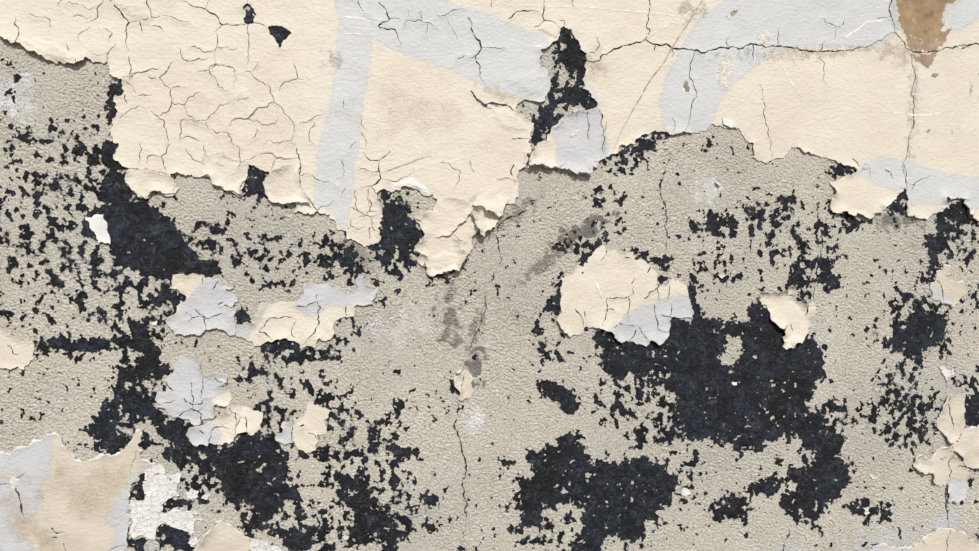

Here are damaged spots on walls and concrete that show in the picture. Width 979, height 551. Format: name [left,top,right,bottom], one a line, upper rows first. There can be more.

crack [14,0,414,235]
crack [589,0,979,191]
peeling [0,0,979,393]
peeling [0,413,284,551]
peeling [127,355,389,511]
peeling [351,480,418,533]
peeling [453,369,474,401]
peeling [534,245,694,451]
peeling [870,527,979,551]